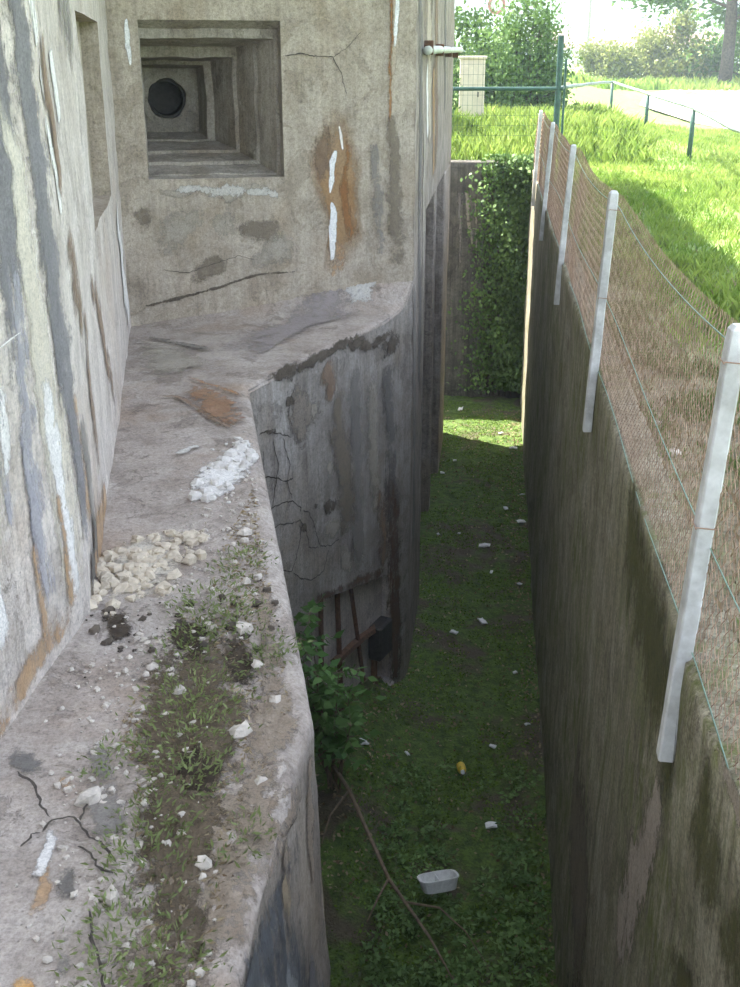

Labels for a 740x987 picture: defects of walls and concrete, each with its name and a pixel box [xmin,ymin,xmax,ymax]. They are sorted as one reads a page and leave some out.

crack [287,32,361,93]
corrosion [314,122,359,276]
water stain [0,0,114,603]
spalling [268,330,399,447]
crack [260,388,339,581]
corrosion [57,496,74,604]
corrosion [0,544,65,736]
water stain [56,870,75,898]
crack [17,771,116,873]
crack [89,909,105,987]
water stain [244,862,323,987]
water stain [615,776,663,973]